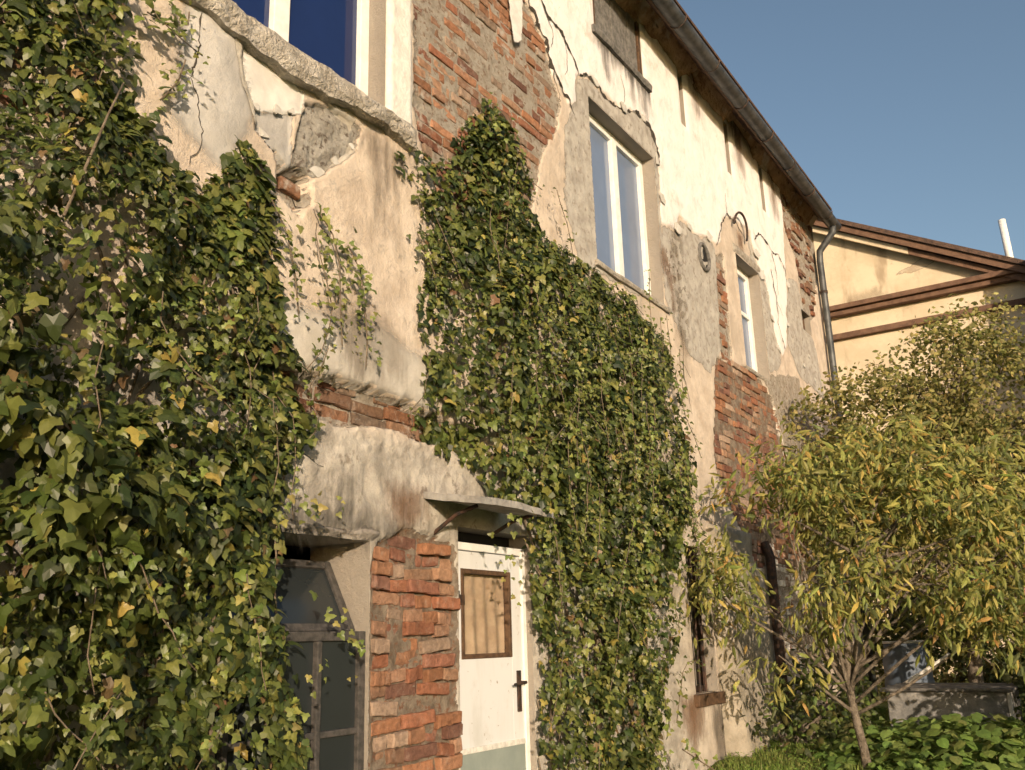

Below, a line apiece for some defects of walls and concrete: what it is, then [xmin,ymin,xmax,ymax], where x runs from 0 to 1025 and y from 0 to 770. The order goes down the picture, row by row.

crack [179,13,204,164]
flaking render [235,38,360,216]
crack [528,0,660,166]
flaking render [217,384,250,404]
flaking render [269,365,470,452]
flaking render [412,0,836,723]